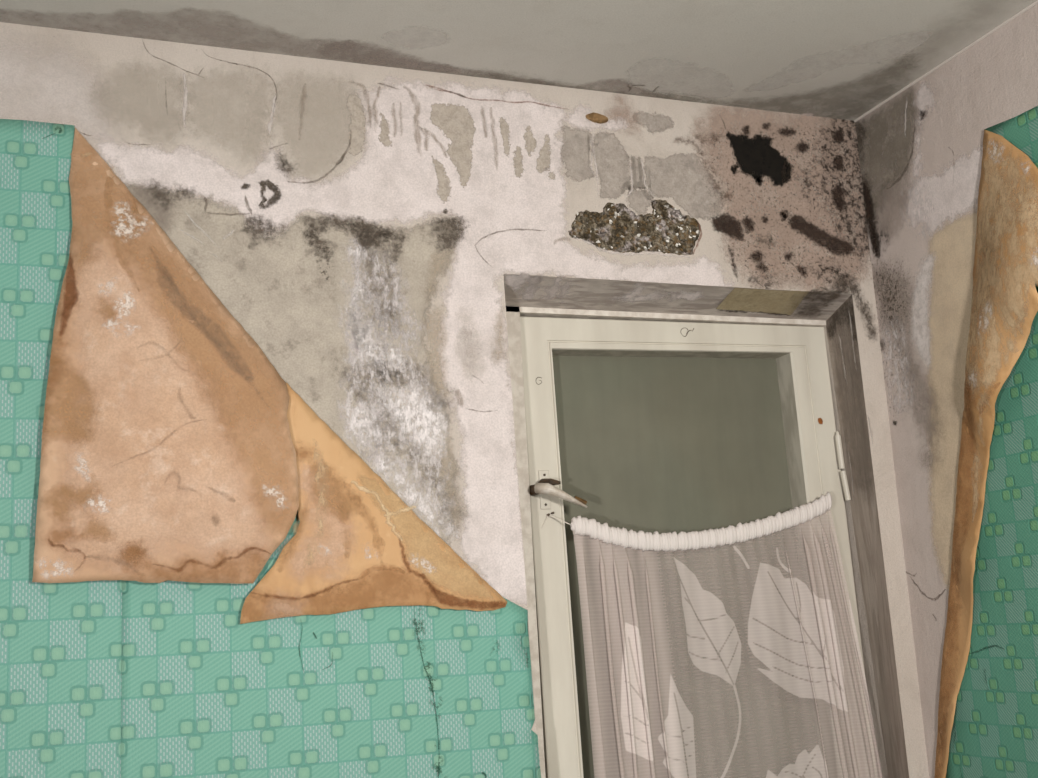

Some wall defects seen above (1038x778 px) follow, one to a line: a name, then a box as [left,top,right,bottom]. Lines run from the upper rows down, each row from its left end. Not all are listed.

damp [242,180,283,245]
damp [63,15,464,75]
peeling [346,94,392,156]
damp [433,209,464,273]
peeling [430,103,476,204]
peeling [499,106,723,257]
damp [607,80,669,99]
damp [687,82,935,425]
peeling [32,127,507,624]
damp [304,215,457,537]
peeling [906,129,1038,778]
crack [414,620,442,776]